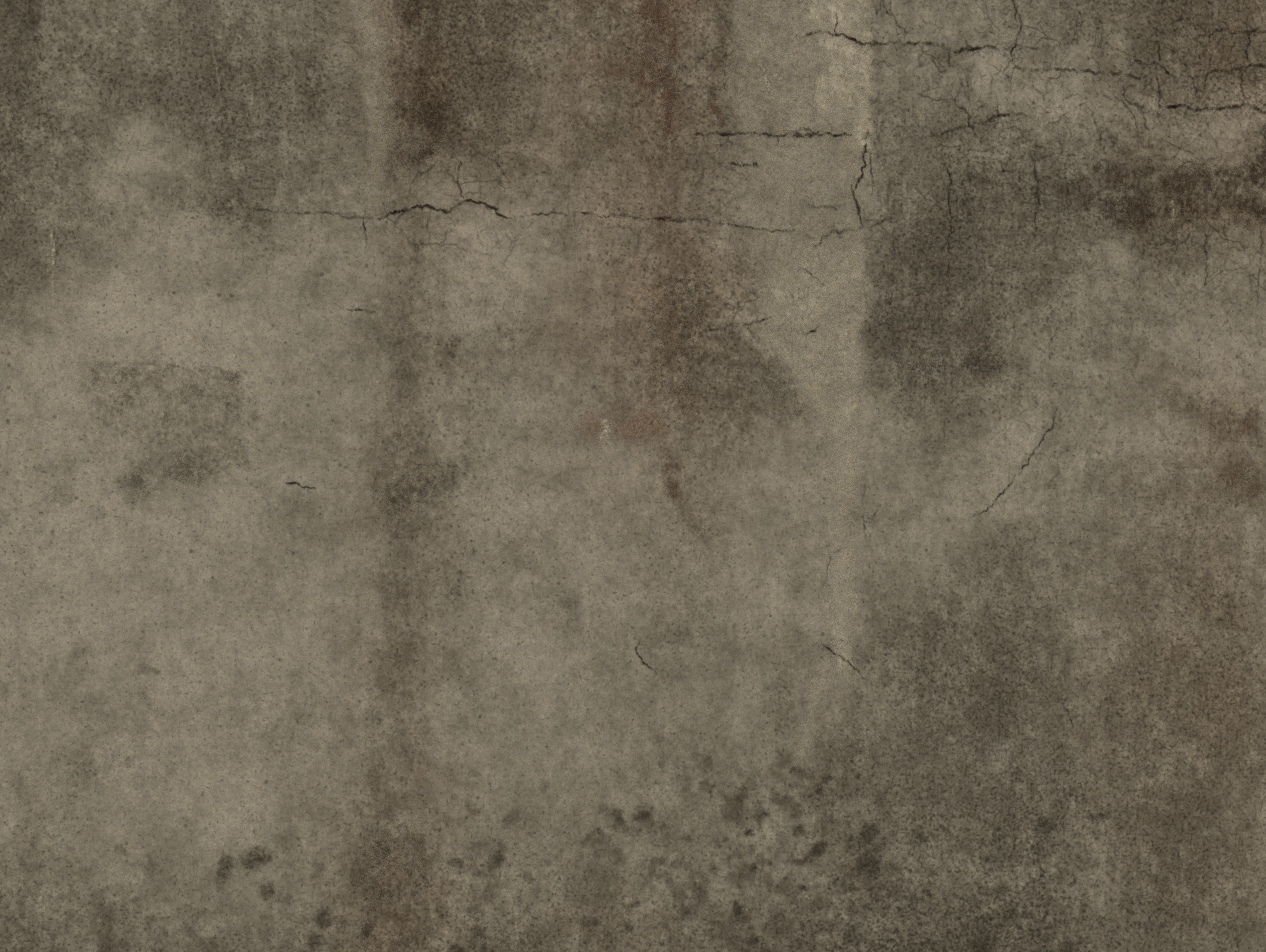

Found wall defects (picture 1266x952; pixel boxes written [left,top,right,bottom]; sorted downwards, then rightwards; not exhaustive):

water stain [739,0,874,216]
crack [806,0,1266,135]
crack [259,161,612,236]
crack [698,128,885,298]
crack [945,164,953,250]
water stain [1083,128,1266,224]
water stain [768,240,865,489]